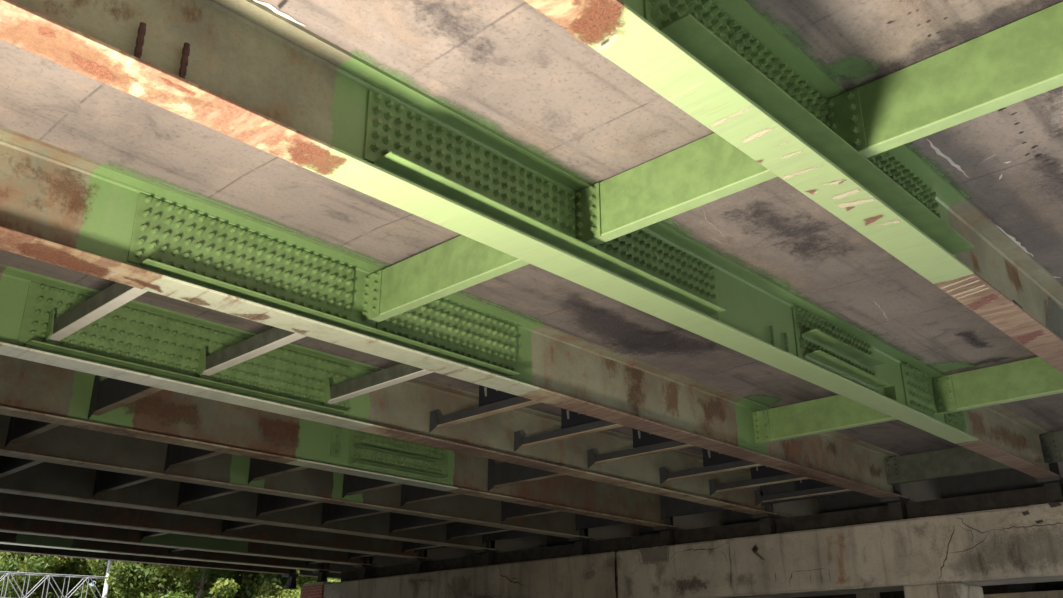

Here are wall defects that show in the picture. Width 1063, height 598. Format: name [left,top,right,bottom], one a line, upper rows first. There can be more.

rust [570,0,622,45]
rust [4,22,131,90]
rust [146,77,208,106]
rust [288,140,346,175]
rust [19,243,110,278]
rust [125,277,161,292]
crack [936,515,1063,596]